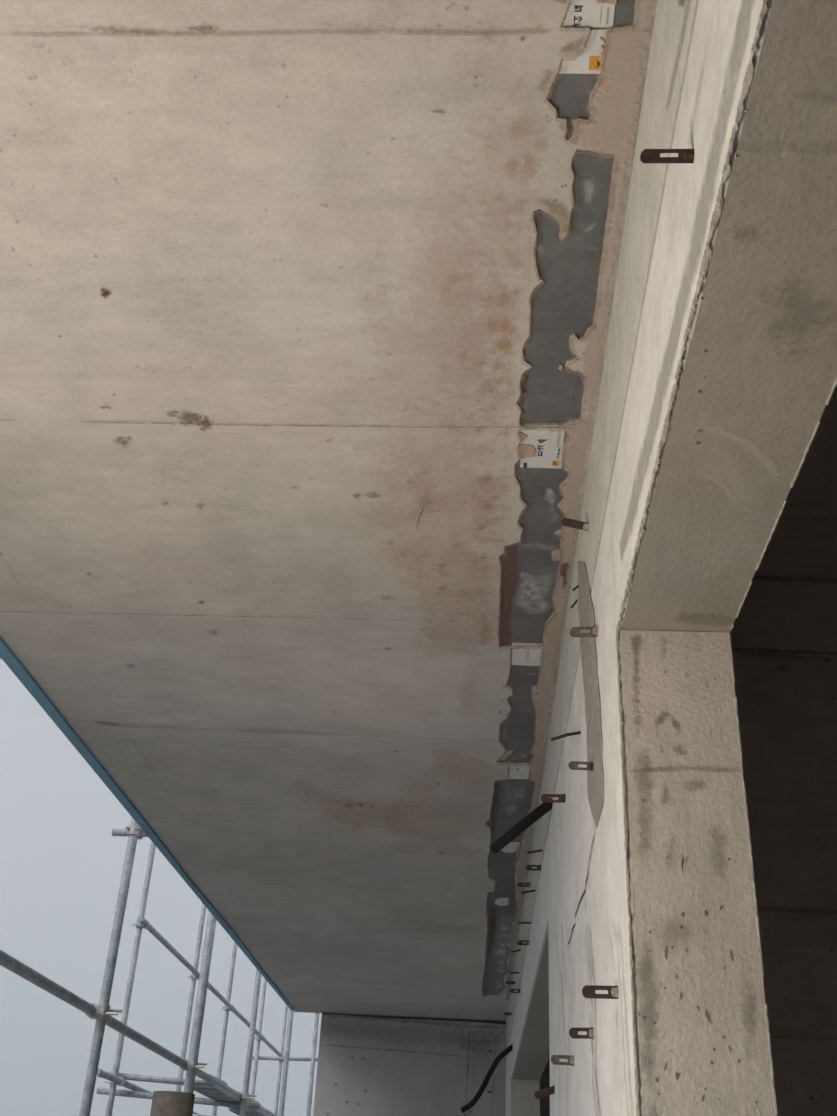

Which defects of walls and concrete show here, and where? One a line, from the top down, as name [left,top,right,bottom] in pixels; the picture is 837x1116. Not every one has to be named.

peeling [482,0,636,997]